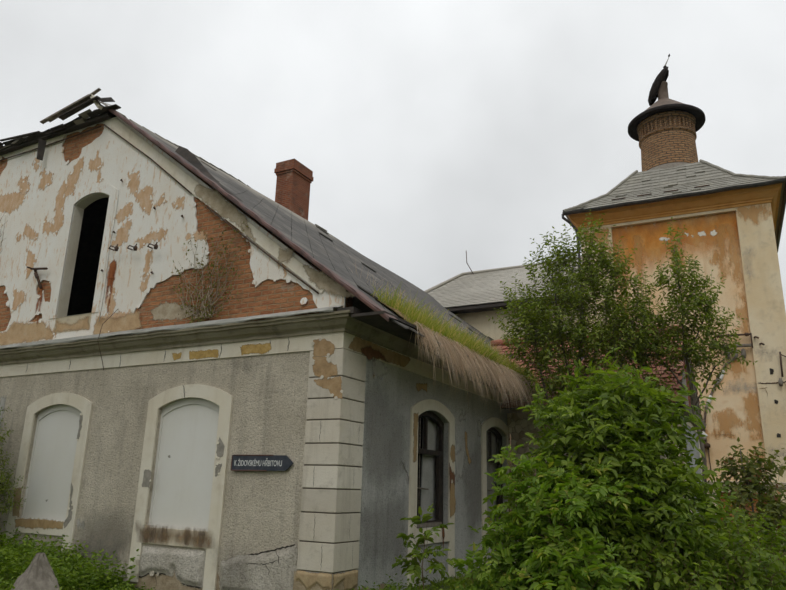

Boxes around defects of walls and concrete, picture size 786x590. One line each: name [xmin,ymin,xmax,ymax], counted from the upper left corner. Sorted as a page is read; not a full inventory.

flaking render [0,124,105,279]
flaking render [98,171,319,335]
leakage [584,205,771,284]
flaking render [0,286,26,332]
flaking render [30,311,56,340]
flaking render [37,279,51,302]
corrosion [106,261,116,312]
peeling [173,349,219,360]
peeling [311,338,343,400]
leakage [140,526,211,548]
crack [248,544,295,576]